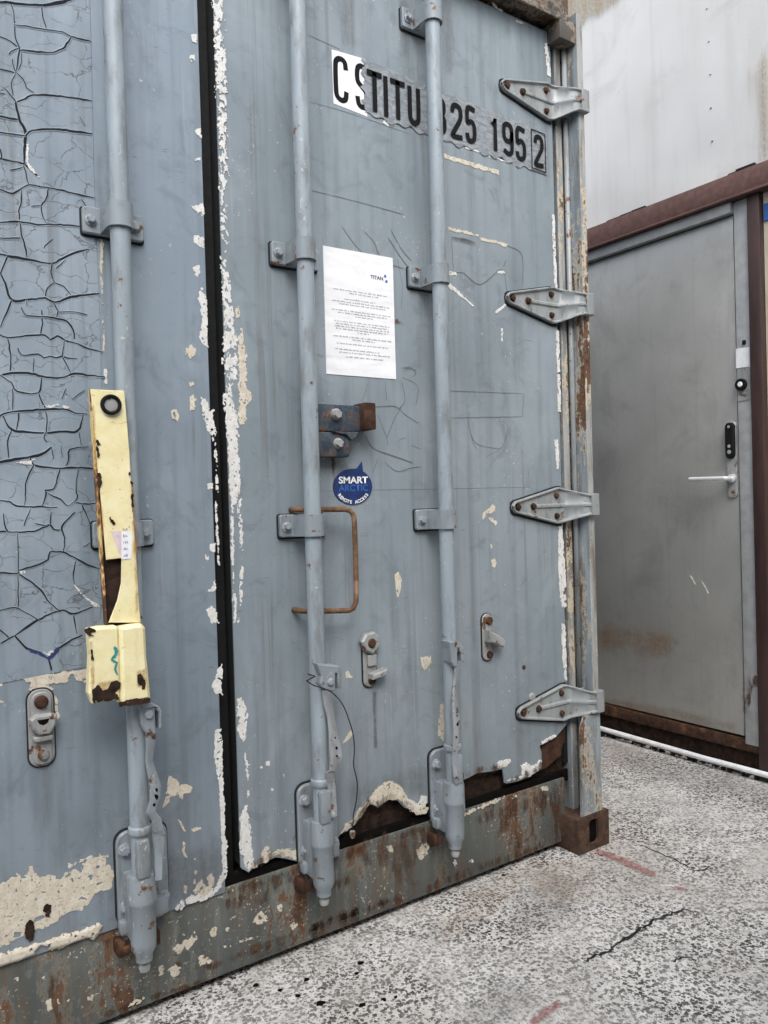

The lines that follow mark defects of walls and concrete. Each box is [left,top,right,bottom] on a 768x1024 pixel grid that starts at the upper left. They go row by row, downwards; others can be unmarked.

crack [0,0,105,671]
peeling [171,0,252,624]
peeling [212,664,223,695]
peeling [495,759,542,781]
peeling [175,697,297,911]
peeling [341,781,429,834]
corrosion [476,790,561,832]
corrosion [337,825,433,882]
crack [641,845,709,871]
peeling [0,853,114,966]
corrosion [309,895,402,939]
crack [586,909,689,962]